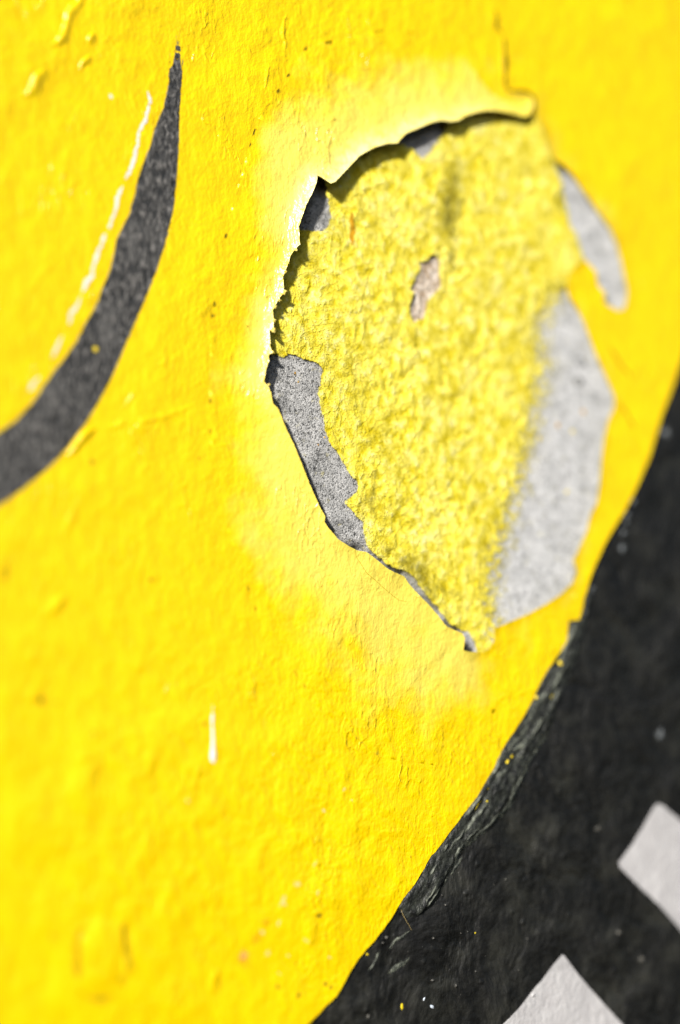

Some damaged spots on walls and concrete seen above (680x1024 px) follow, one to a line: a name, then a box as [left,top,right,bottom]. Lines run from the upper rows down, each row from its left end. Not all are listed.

peeling [198,29,643,918]